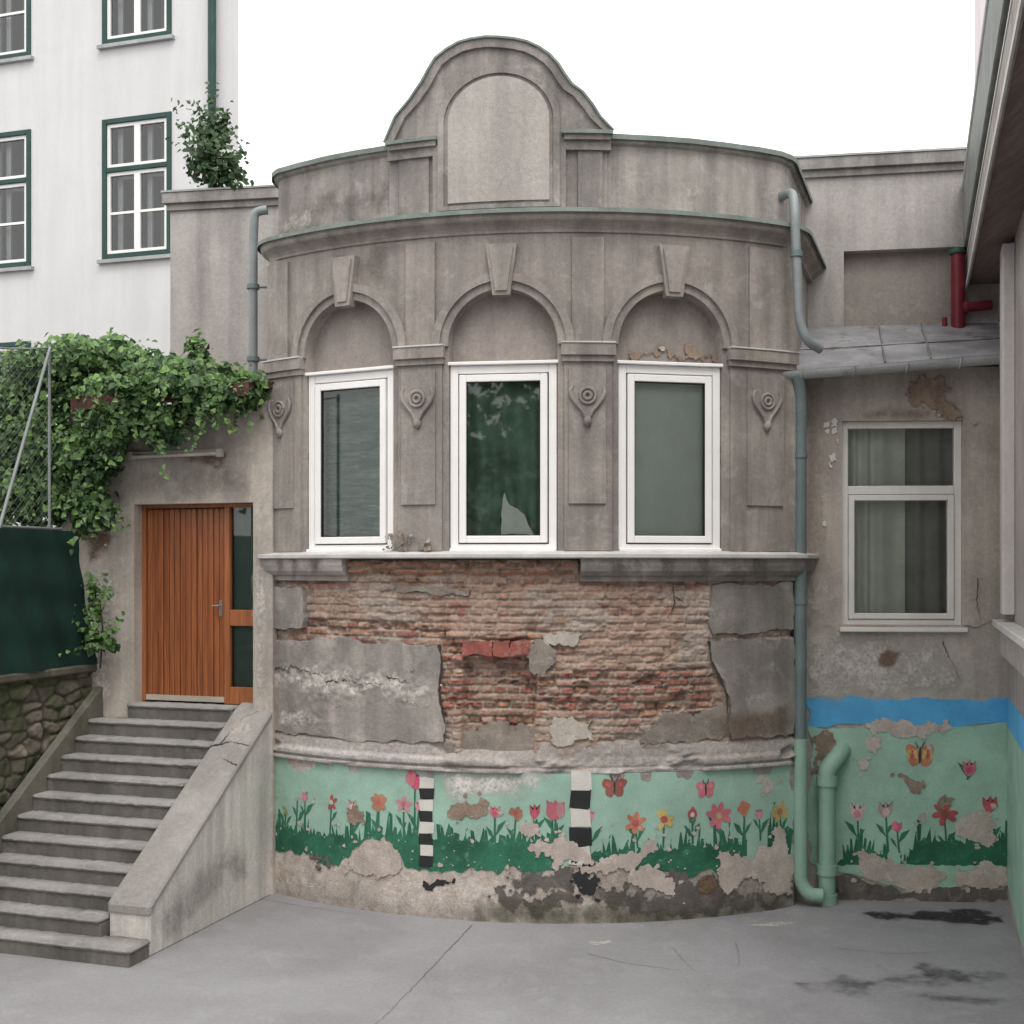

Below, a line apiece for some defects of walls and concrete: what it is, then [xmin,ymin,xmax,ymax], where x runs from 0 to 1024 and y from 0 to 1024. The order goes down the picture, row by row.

flaking render [629,341,717,363]
flaking render [905,374,976,425]
flaking render [274,530,791,770]
crack [705,641,731,739]
crack [209,711,258,766]
peeling [810,729,836,774]
peeling [854,718,952,777]
peeling [890,773,926,795]
peeling [305,804,414,881]
peeling [438,791,794,921]
peeling [840,804,1007,894]
damp [836,874,1008,925]